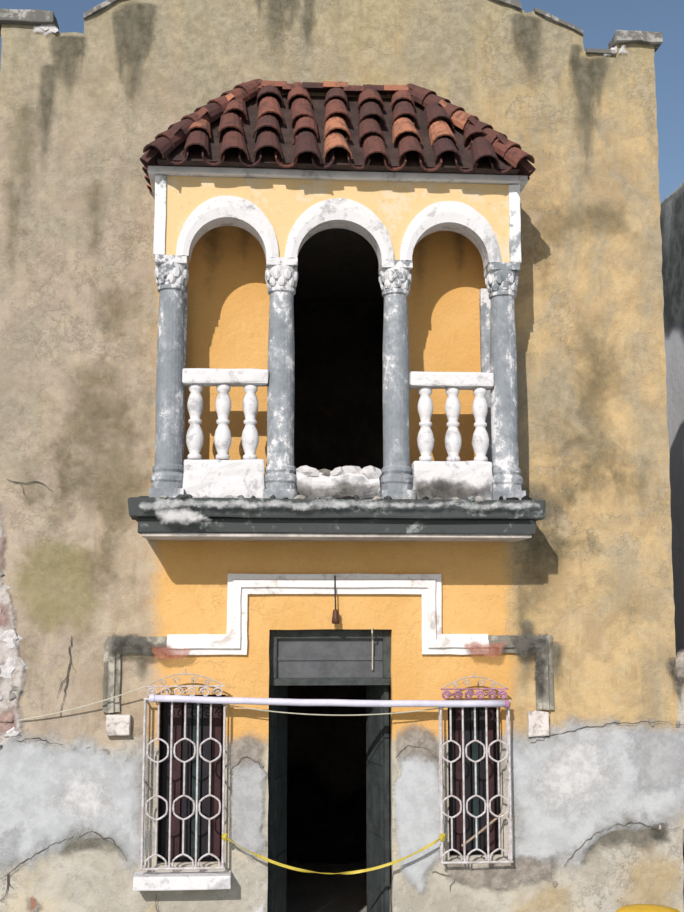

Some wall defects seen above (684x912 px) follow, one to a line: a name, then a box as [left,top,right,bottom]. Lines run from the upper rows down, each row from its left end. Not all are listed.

damp [41,36,84,133]
damp [115,3,153,88]
damp [259,0,313,37]
damp [571,44,606,133]
crack [56,636,76,717]
peeling [0,527,148,879]
peeling [395,719,684,908]